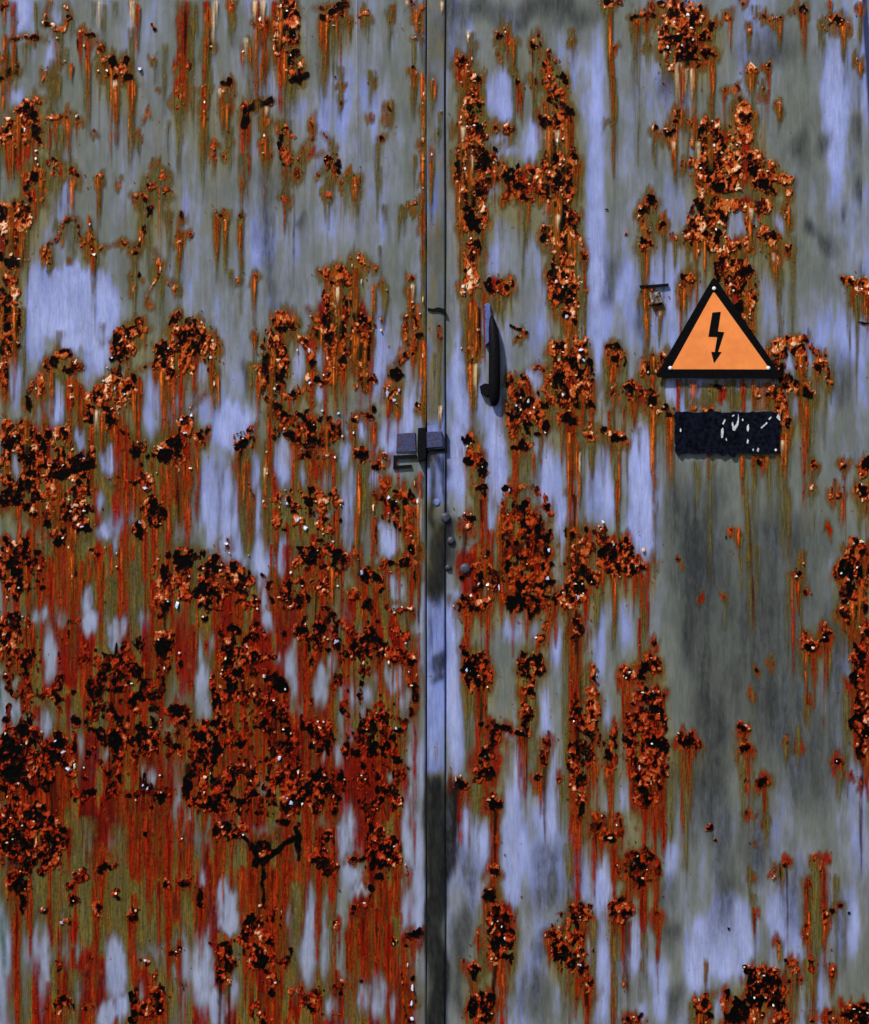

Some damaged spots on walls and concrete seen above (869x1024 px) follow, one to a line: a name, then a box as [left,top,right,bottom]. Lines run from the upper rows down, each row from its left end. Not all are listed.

corrosion [0,0,442,1024]
crack [242,818,303,905]
corrosion [387,0,869,1024]